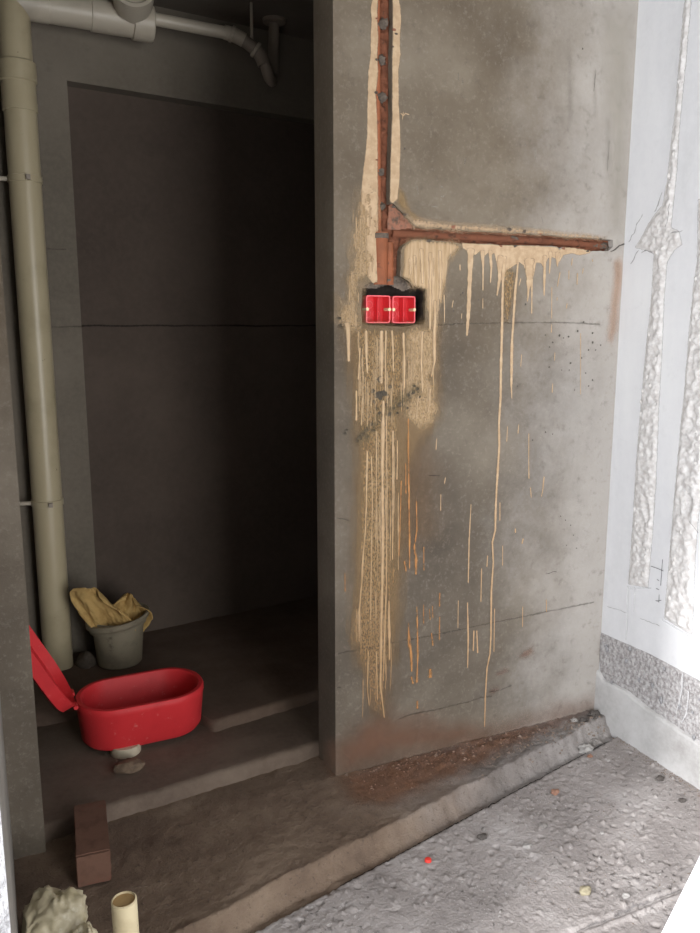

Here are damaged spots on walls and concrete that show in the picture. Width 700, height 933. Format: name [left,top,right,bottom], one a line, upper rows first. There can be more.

corrosion [350,731,529,799]